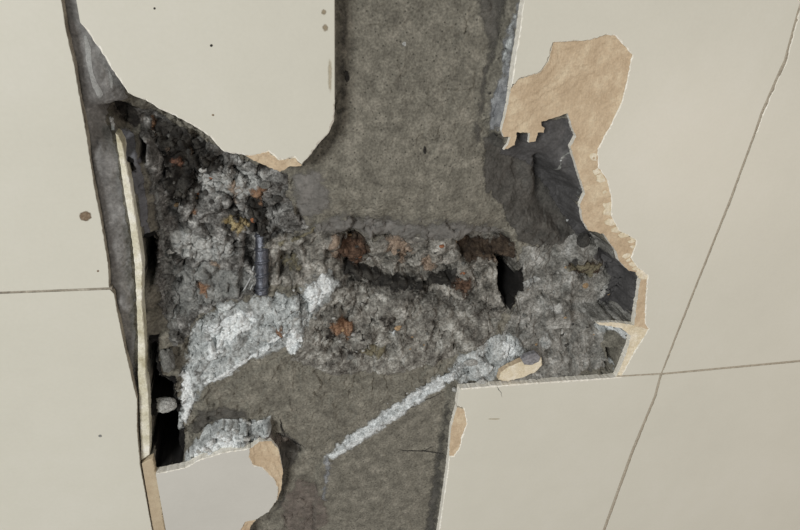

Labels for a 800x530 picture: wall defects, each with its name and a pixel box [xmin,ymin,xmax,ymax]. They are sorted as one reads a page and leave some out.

corrosion [327,234,367,267]
spalling [80,2,649,390]
spalling [111,133,152,529]
peeling [156,437,283,514]
peeling [439,403,467,530]